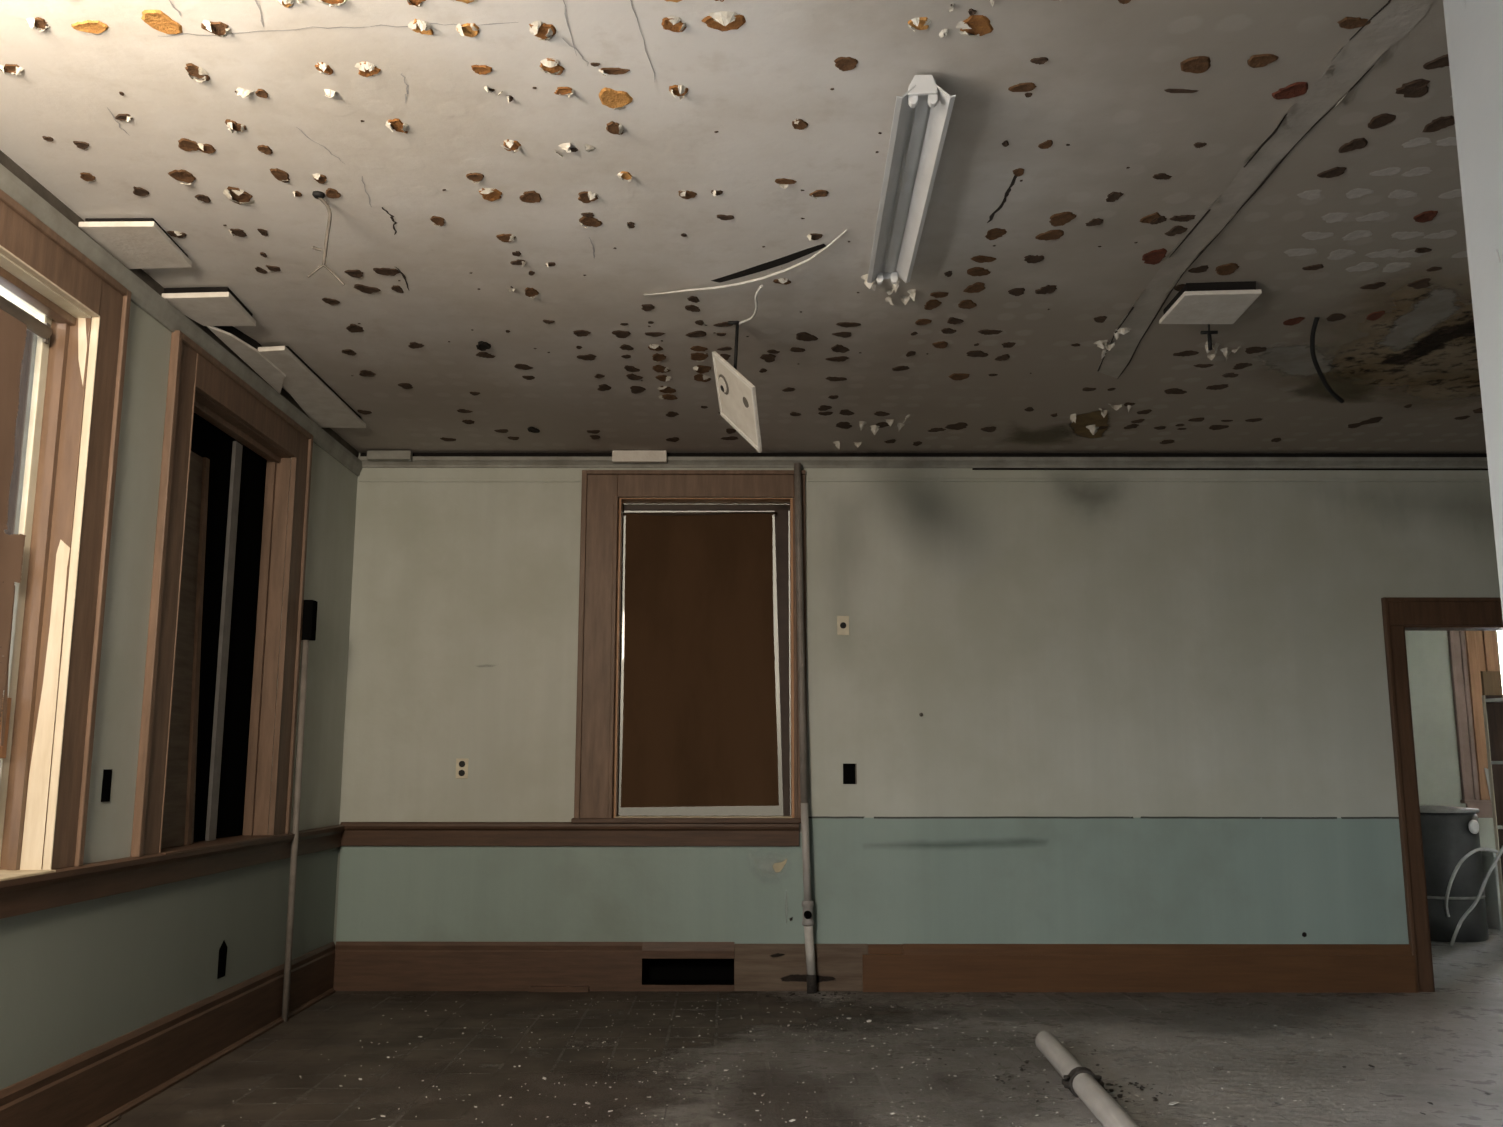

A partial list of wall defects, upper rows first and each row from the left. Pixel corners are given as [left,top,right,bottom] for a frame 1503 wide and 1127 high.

peeling [529,21,554,41]
crack [563,0,589,66]
crack [630,0,655,80]
peeling [708,0,739,26]
peeling [908,3,979,38]
peeling [316,62,337,98]
peeling [354,62,376,72]
peeling [540,59,560,74]
peeling [554,143,595,157]
crack [987,175,1017,223]
peeling [78,318,87,385]
damp [1302,285,1481,401]